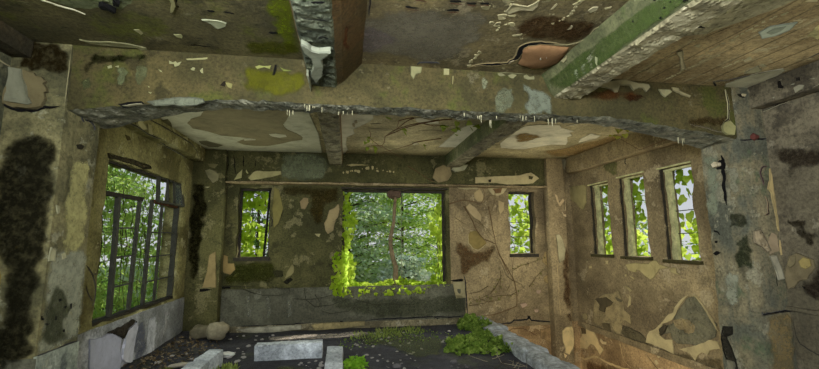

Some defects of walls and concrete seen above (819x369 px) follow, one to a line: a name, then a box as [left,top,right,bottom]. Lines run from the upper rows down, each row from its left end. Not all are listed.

peeling [489,0,539,37]
peeling [119,86,322,153]
crack [690,75,750,132]
crack [740,133,767,141]
flaking render [457,173,539,221]
crack [711,155,727,205]
damp [0,135,89,369]
mould [189,184,207,278]
crack [502,263,561,336]
flaking render [562,260,738,369]
damp [804,271,819,299]
peeling [89,319,138,369]